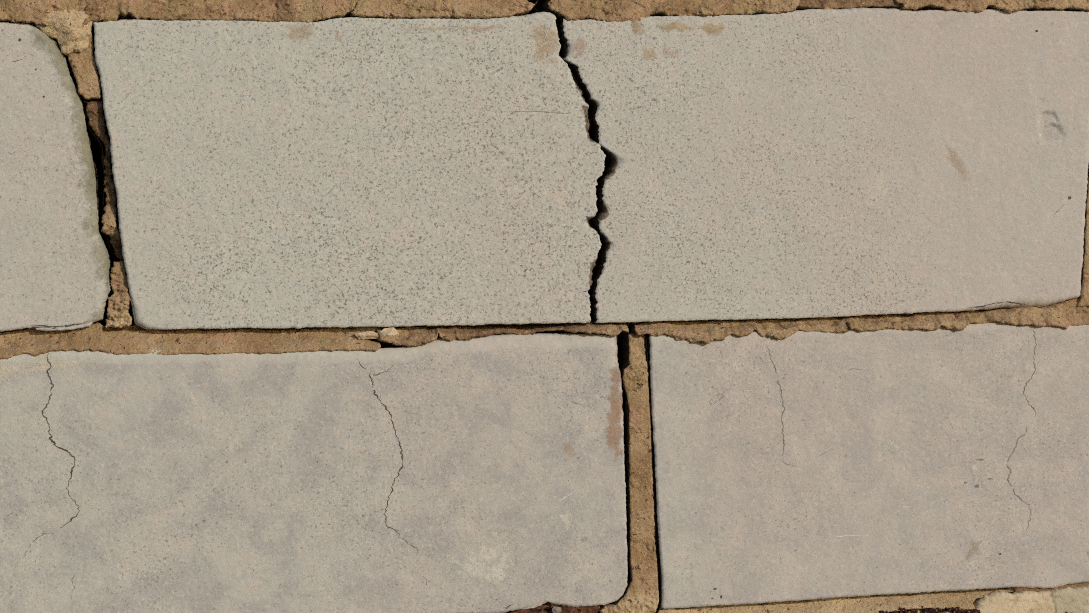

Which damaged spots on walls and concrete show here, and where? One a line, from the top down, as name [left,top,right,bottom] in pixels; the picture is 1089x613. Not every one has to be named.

crack [65,58,114,318]
crack [93,0,1089,330]
crack [23,353,80,558]
crack [359,362,427,584]
crack [617,323,635,598]
crack [645,335,662,613]
crack [768,348,794,466]
crack [1007,329,1037,528]